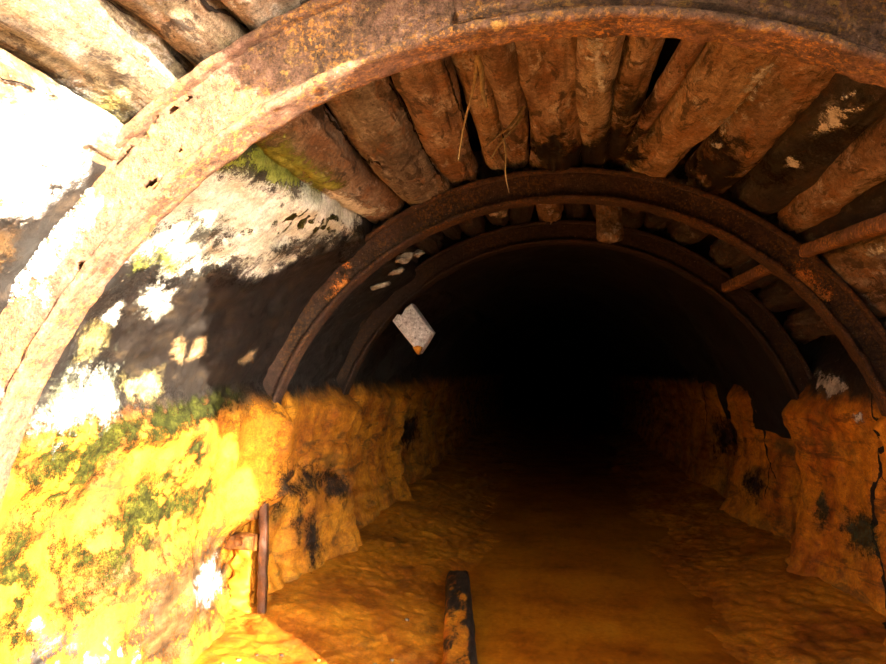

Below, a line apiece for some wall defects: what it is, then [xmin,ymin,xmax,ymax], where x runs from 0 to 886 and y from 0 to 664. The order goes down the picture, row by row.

water stain [0,76,137,309]
corrosion [323,261,352,300]
corrosion [779,259,837,304]
crack [870,395,886,629]
water stain [17,517,242,664]
corrosion [224,574,285,632]